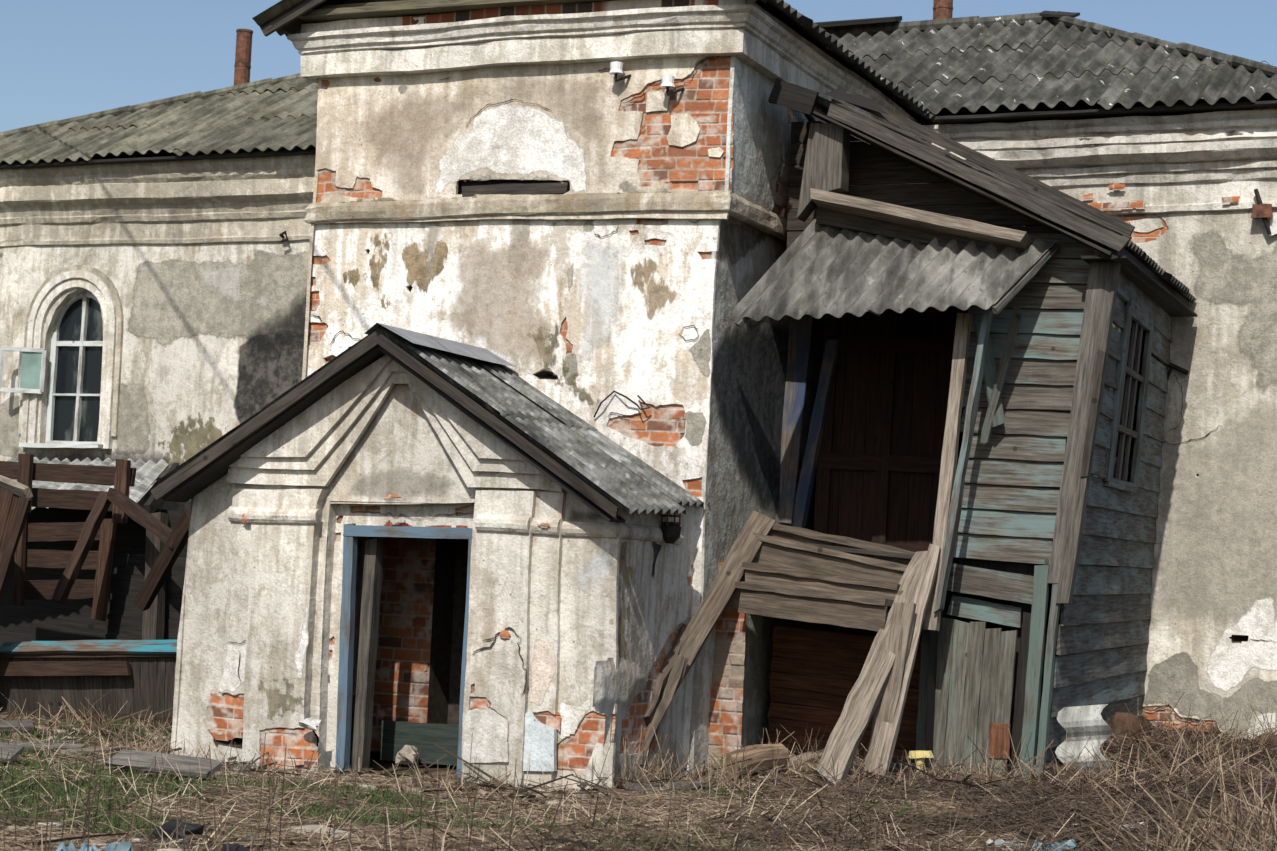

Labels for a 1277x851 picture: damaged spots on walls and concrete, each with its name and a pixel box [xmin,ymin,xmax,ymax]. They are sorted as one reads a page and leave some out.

spalling [611,56,734,191]
spalling [316,168,383,203]
spalling [1080,183,1169,244]
water stain [343,222,448,308]
water stain [451,219,548,358]
spalling [607,402,686,447]
spalling [1229,635,1271,643]
spalling [206,640,246,749]
peeling [213,623,687,814]
spalling [1143,705,1221,736]
peeling [0,821,183,851]